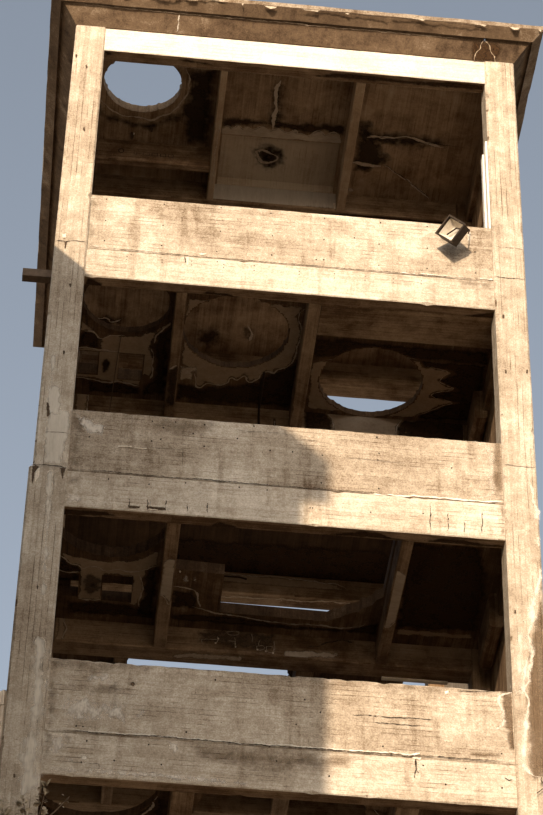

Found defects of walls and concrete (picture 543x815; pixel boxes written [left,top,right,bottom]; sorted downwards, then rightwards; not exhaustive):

water stain [316,73,483,90]
water stain [100,60,457,224]
crack [353,161,430,199]